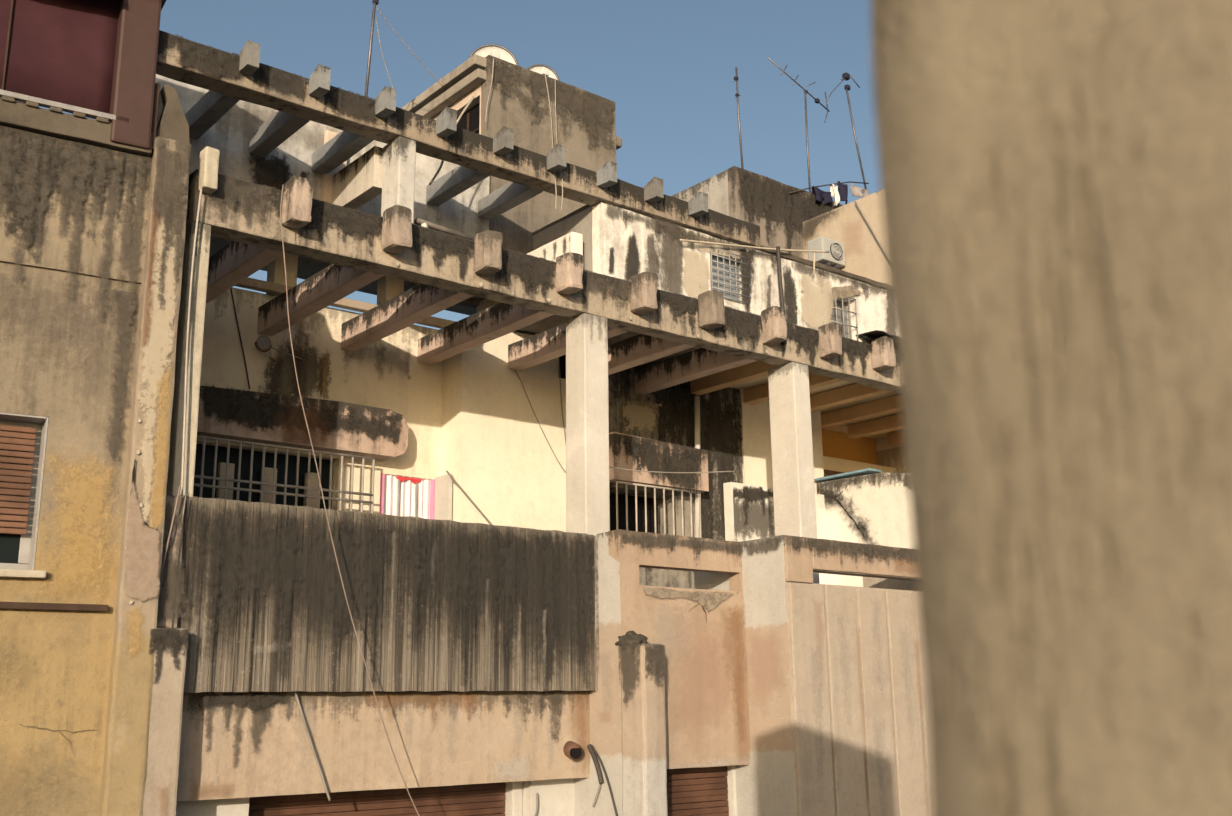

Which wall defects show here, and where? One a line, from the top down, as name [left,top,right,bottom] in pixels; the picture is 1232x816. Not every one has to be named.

damp [491,61,616,157]
damp [205,154,309,230]
damp [0,126,186,460]
peeling [125,223,177,604]
damp [204,340,400,444]
damp [619,381,915,563]
damp [149,501,599,740]
damp [618,640,666,703]
spalling [644,587,738,611]
damp [188,692,291,767]